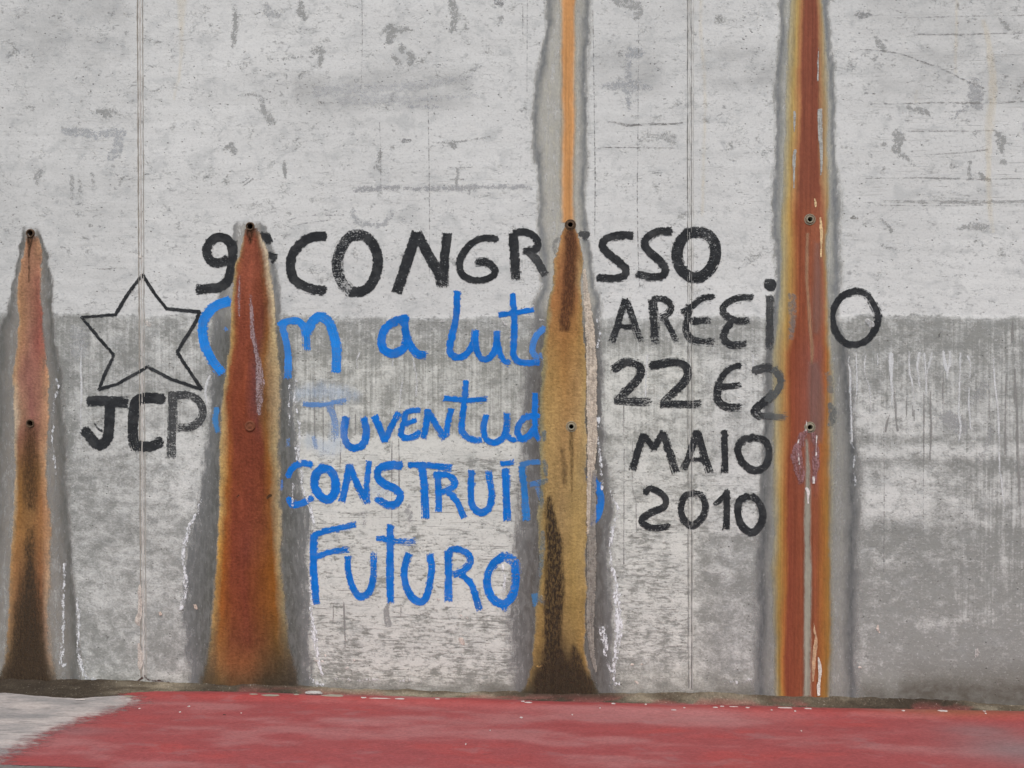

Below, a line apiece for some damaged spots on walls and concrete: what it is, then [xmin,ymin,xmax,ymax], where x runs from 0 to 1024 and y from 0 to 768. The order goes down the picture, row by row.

corrosion [0,236,57,681]
corrosion [200,228,299,686]
corrosion [521,0,599,694]
damp [500,0,623,693]
corrosion [764,0,837,697]